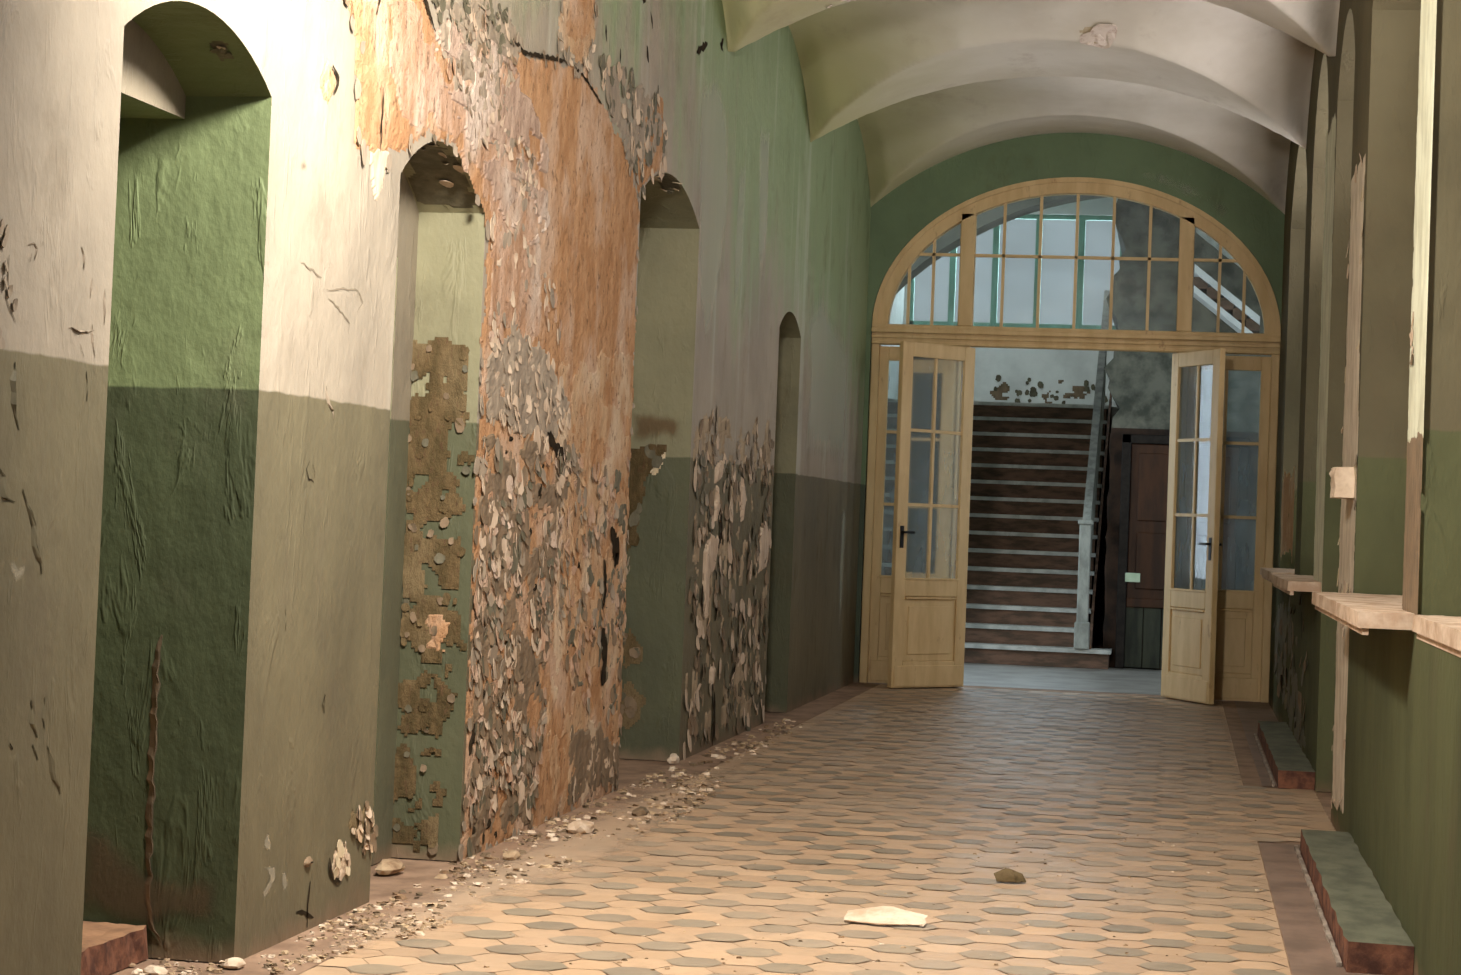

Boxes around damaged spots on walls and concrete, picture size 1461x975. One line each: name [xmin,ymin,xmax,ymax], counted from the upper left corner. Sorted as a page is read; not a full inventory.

crack [10,362,20,430]
flaking render [320,0,682,862]
crack [0,469,42,574]
peeling [683,407,775,761]
flaking render [329,801,378,884]